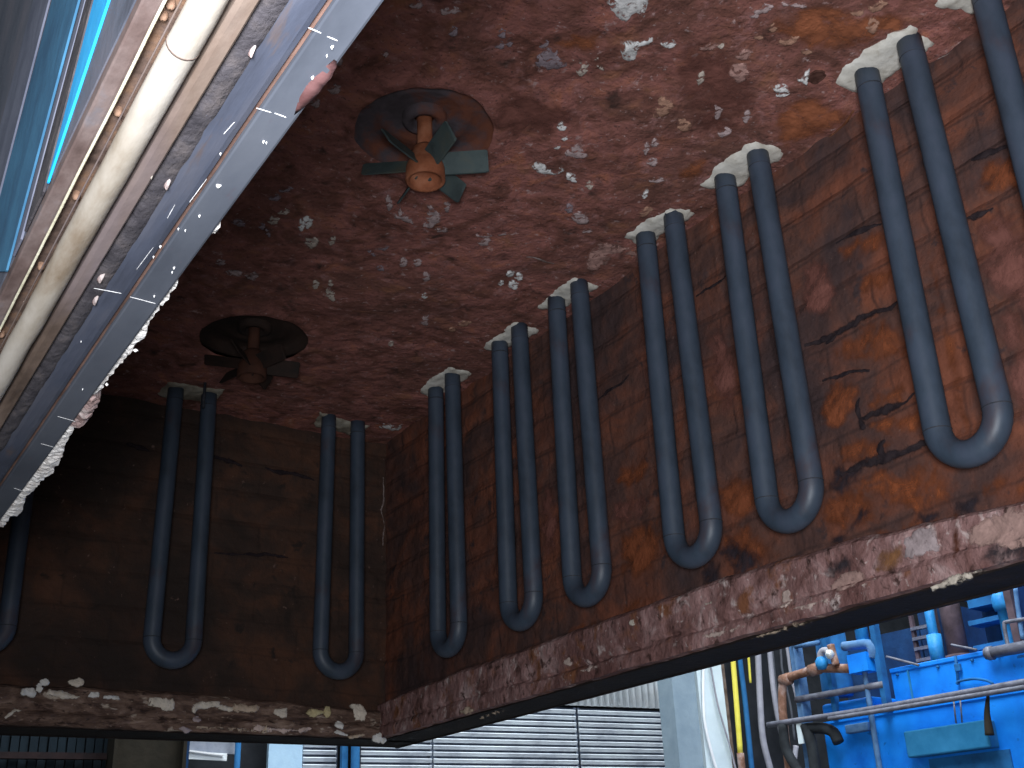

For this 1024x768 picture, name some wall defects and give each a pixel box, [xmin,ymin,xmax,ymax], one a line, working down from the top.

corrosion [777,8,902,48]
spalling [621,38,676,61]
spalling [554,122,589,159]
corrosion [778,99,842,142]
spalling [532,162,593,190]
crack [967,208,993,221]
crack [804,301,898,347]
corrosion [822,383,857,427]
crack [822,369,927,476]
spalling [21,678,121,700]
spalling [149,697,175,711]
spalling [179,701,387,744]